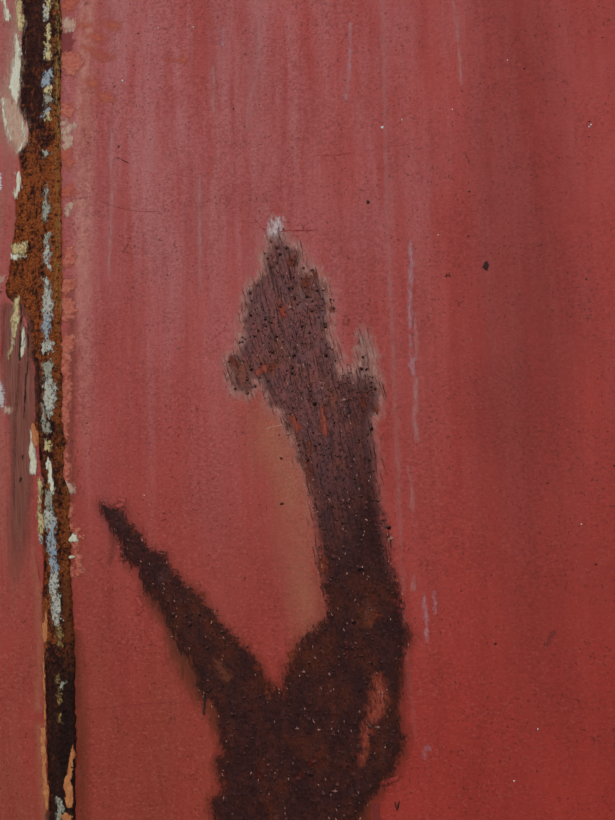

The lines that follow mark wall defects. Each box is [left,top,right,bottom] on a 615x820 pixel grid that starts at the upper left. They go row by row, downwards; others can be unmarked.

peeling [0,0,28,152]
peeling [11,241,28,260]
peeling [8,296,25,359]
corrosion [99,217,414,820]